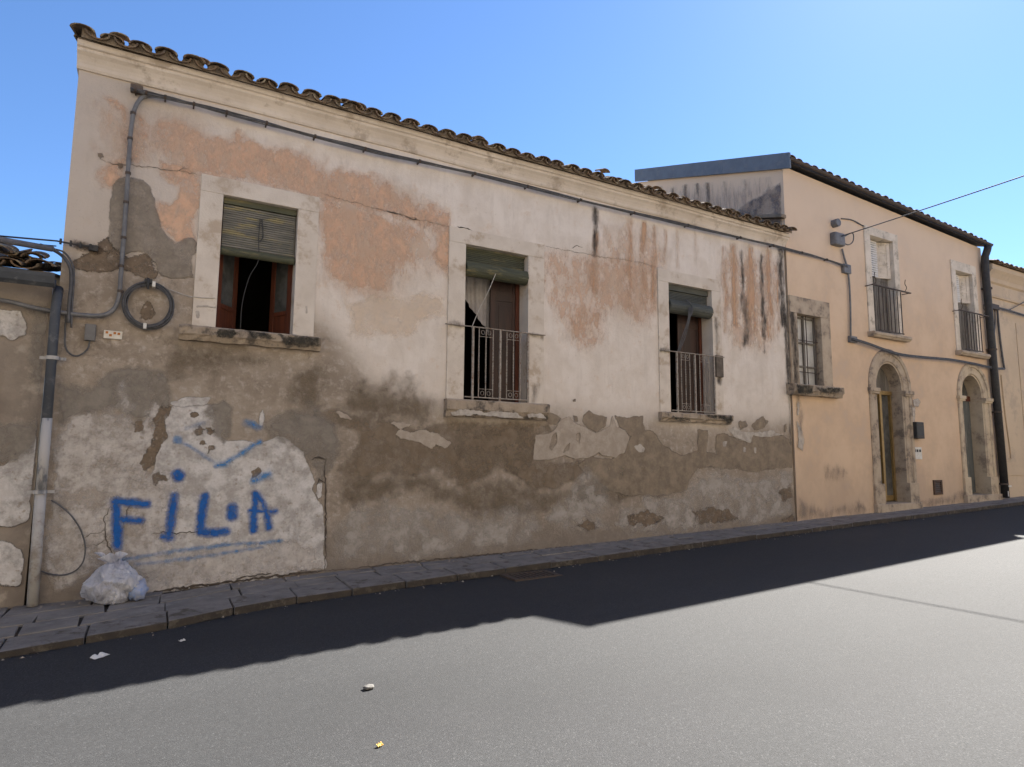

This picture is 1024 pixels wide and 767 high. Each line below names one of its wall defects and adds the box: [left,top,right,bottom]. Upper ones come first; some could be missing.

water stain [740,185,781,225]
spalling [72,237,158,279]
flaking render [0,309,27,341]
water stain [778,249,799,384]
flaking render [0,438,36,527]
flaking render [132,397,327,593]
peeling [391,422,451,449]
water stain [269,370,815,559]
flaking render [451,401,804,496]
spalling [627,510,664,527]
spalling [692,507,737,525]
flaking render [0,540,24,587]